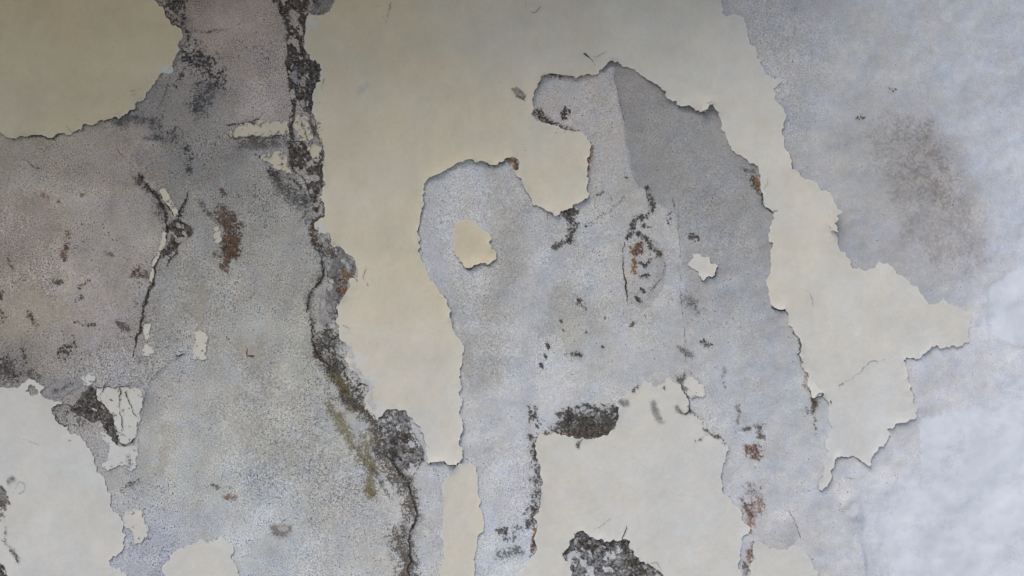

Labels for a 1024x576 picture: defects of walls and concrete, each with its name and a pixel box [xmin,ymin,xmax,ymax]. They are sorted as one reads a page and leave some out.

peeling [0,0,183,139]
crack [132,176,191,356]
rust [196,188,244,273]
crack [305,248,340,377]
peeling [229,0,972,576]
rust [629,241,660,274]
peeling [0,373,150,576]
crack [385,452,418,575]
rust [744,442,762,461]
rust [741,482,765,575]